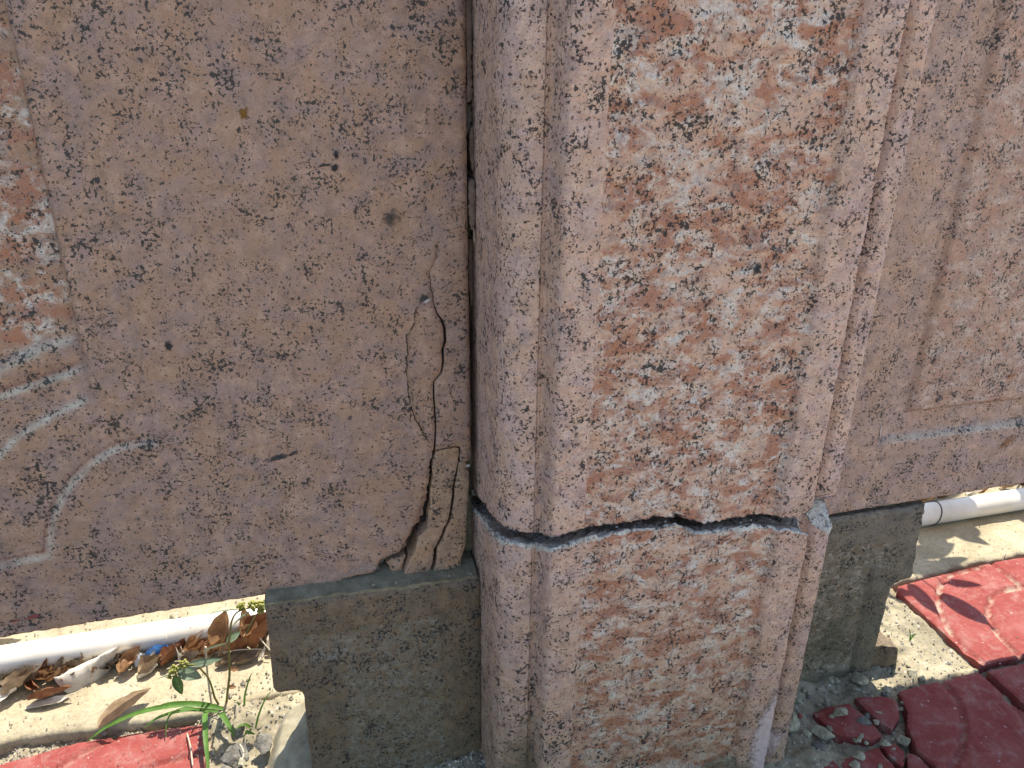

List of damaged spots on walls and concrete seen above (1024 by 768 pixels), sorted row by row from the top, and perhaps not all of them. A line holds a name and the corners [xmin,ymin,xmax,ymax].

crack [380,274,832,574]